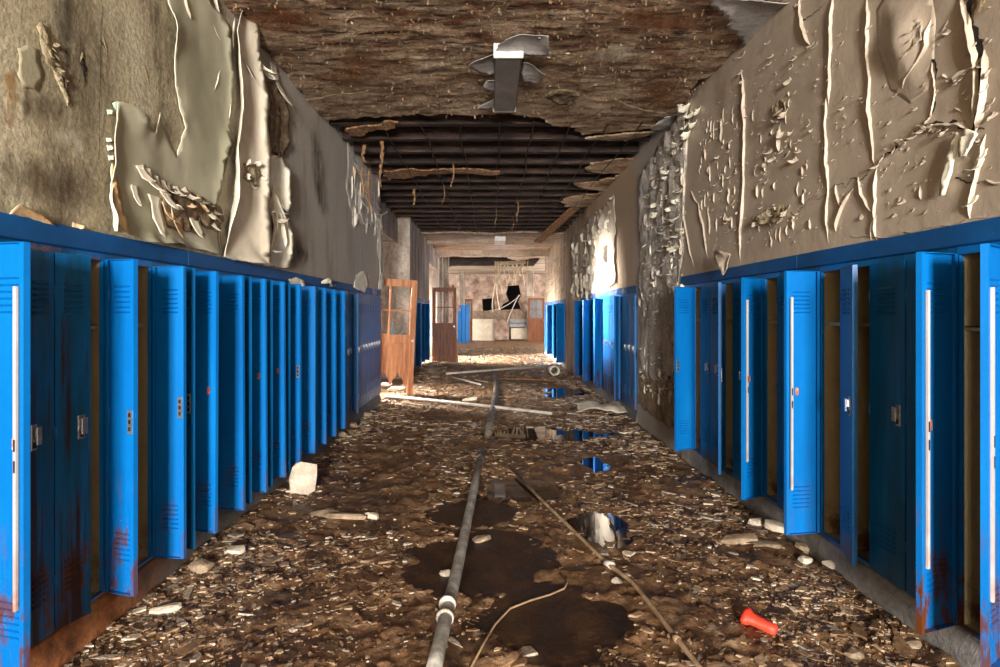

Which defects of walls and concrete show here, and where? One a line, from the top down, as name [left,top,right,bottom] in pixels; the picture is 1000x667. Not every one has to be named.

spalling [36,20,71,106]
spalling [899,18,951,59]
peeling [106,0,294,268]
peeling [913,79,992,196]
spalling [346,141,388,293]
peeling [542,195,616,300]
spalling [637,0,876,428]